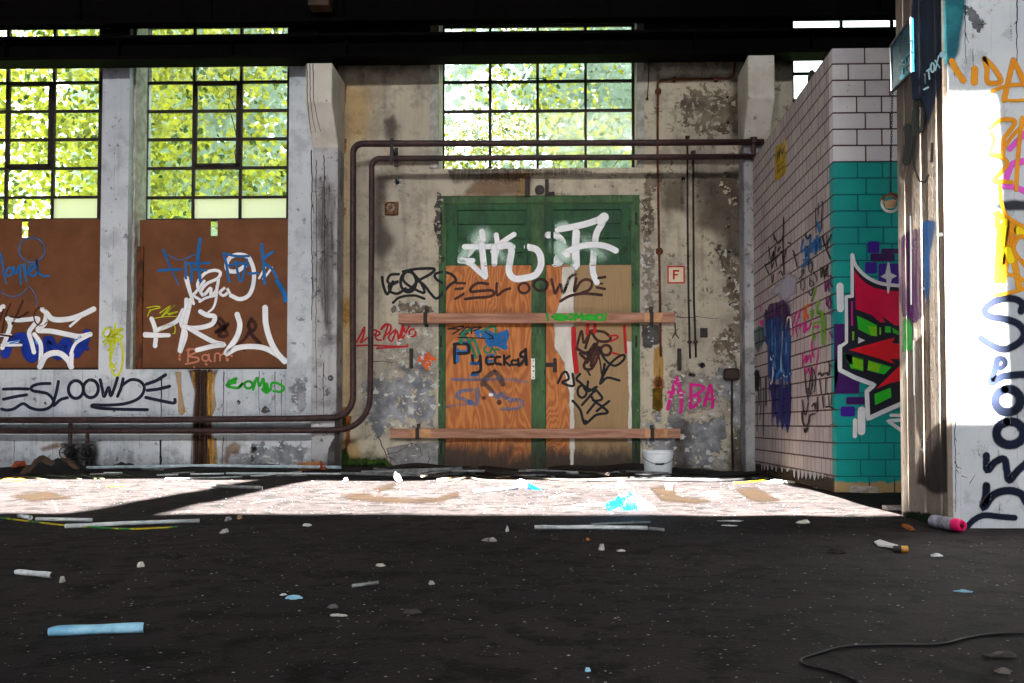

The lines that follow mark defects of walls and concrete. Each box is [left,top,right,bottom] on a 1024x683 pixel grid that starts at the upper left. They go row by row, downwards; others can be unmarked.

peeling [677,83,738,139]
damp [320,184,335,328]
rust [188,370,240,464]
peeling [358,301,440,440]
peeling [387,442,439,465]
peeling [637,244,741,470]